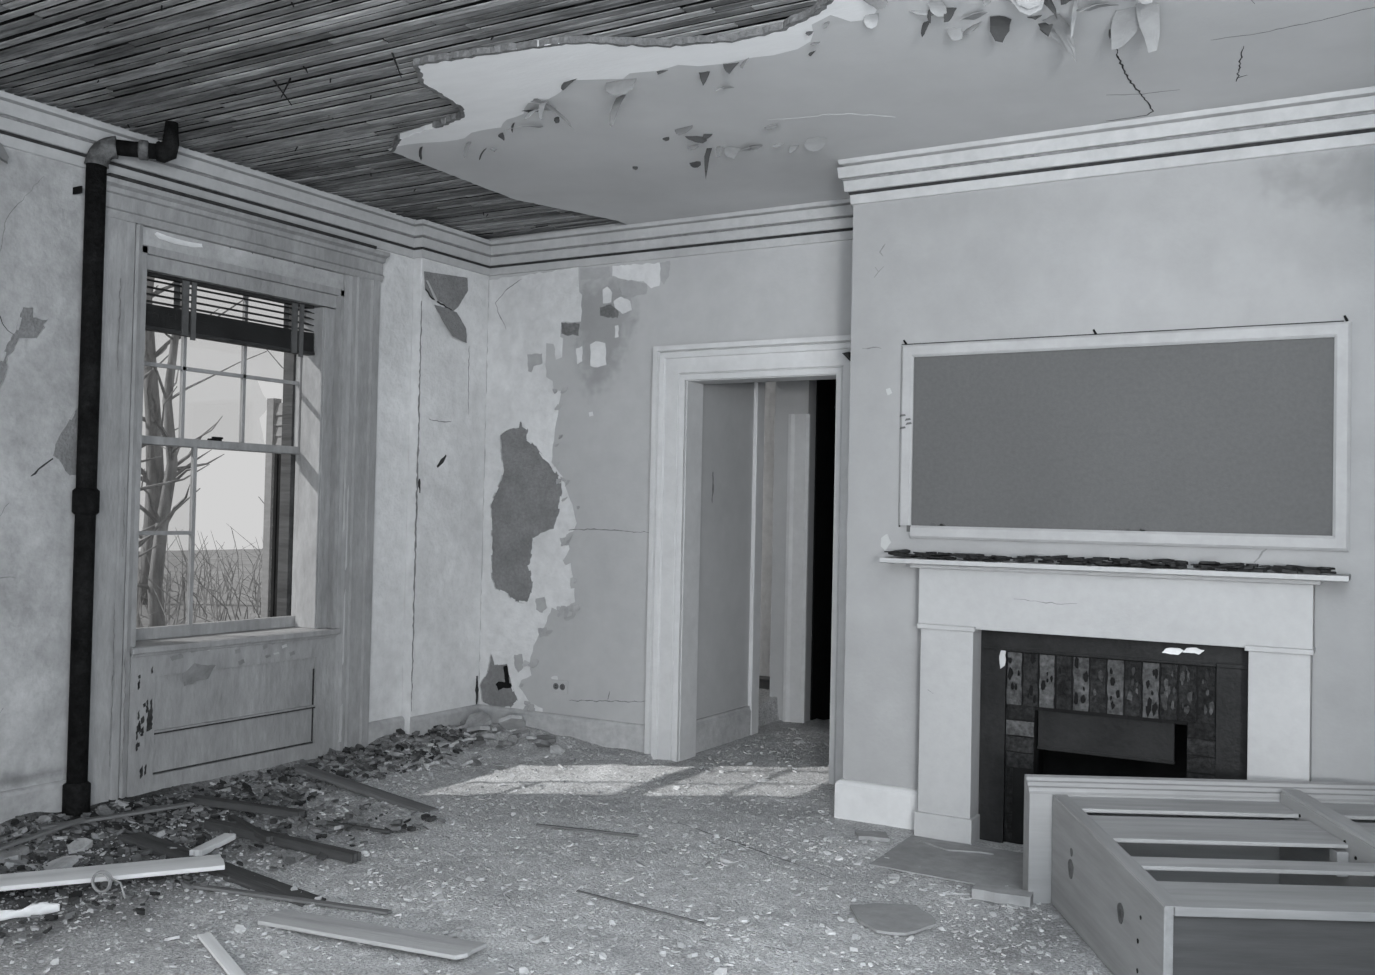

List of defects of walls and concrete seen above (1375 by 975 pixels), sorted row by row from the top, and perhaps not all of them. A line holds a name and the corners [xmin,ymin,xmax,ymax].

peeling [910,0,1160,61]
flaking render [0,0,896,239]
crack [1110,49,1175,121]
flaking render [0,307,50,385]
peeling [479,261,671,717]